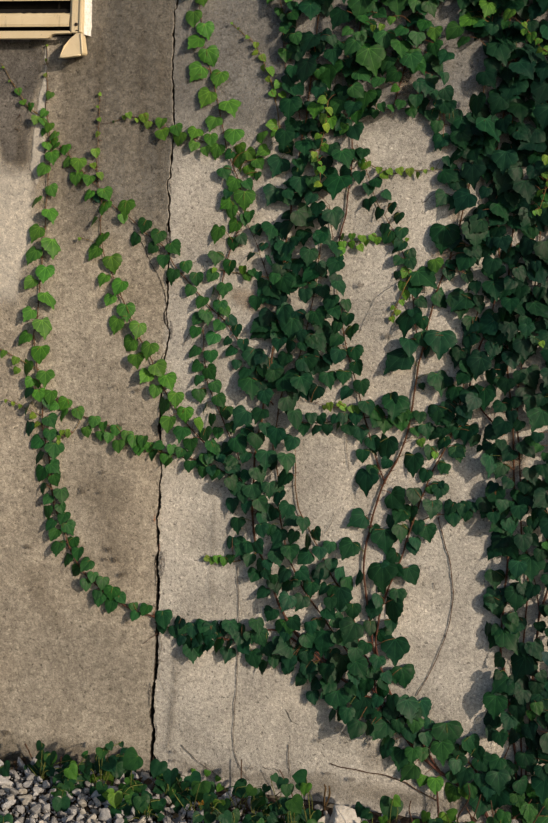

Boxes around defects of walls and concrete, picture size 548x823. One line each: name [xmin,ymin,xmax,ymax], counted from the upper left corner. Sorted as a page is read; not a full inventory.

crack [141,0,179,360]
crack [149,385,163,777]